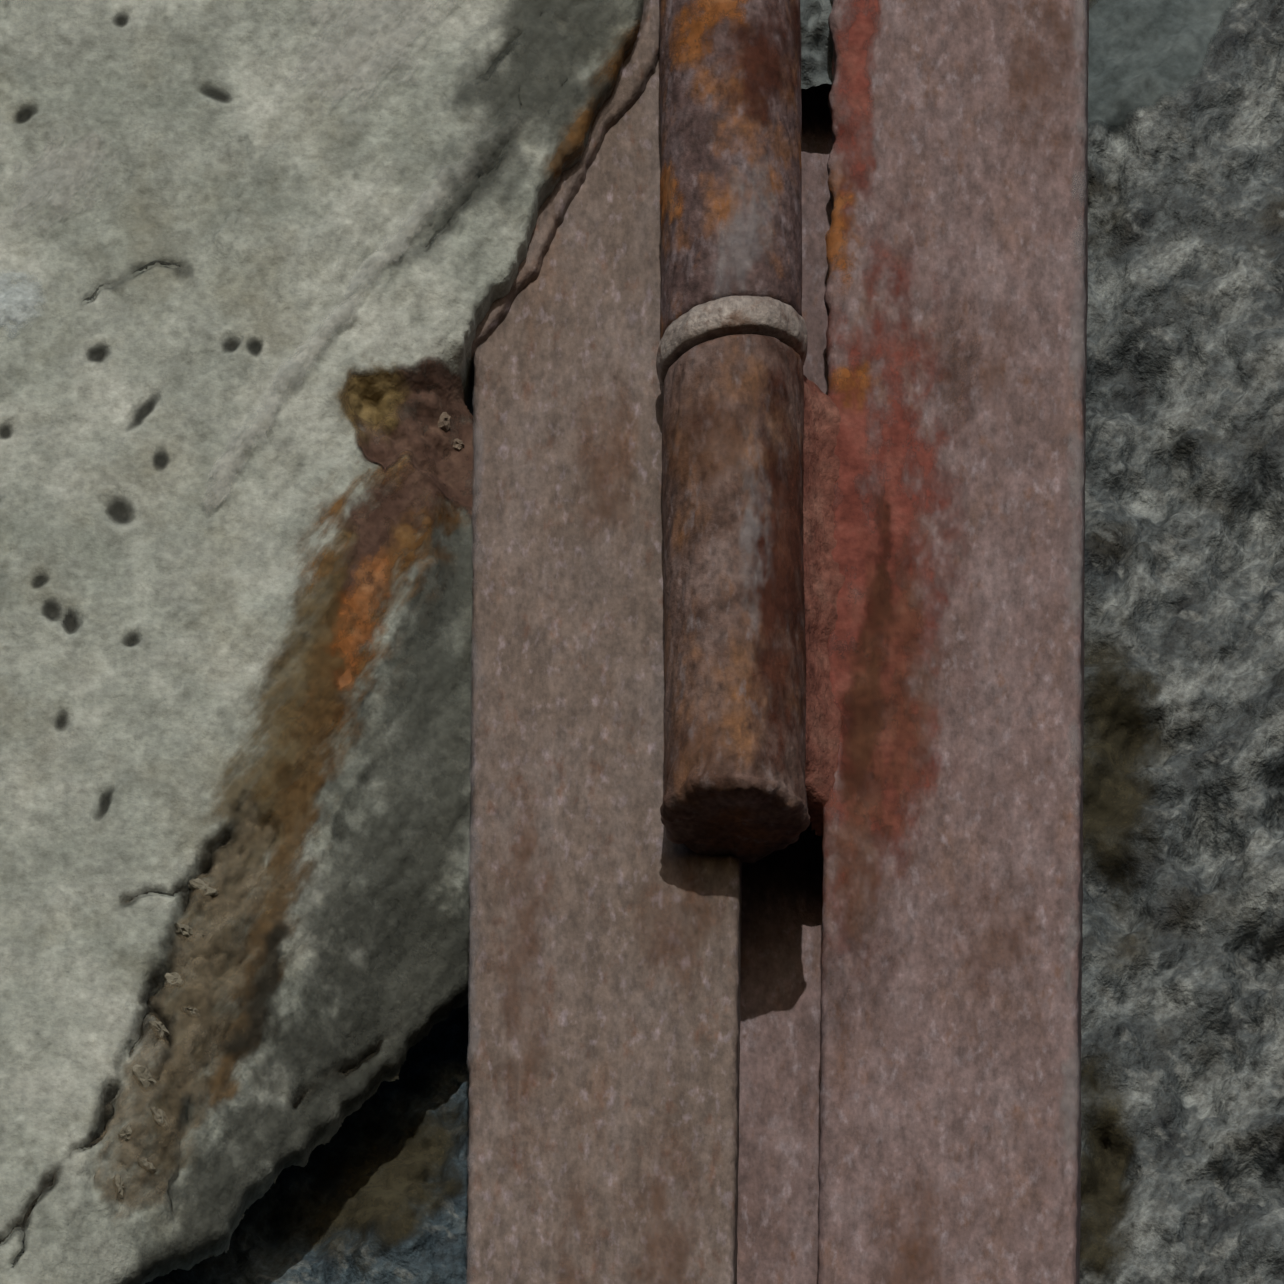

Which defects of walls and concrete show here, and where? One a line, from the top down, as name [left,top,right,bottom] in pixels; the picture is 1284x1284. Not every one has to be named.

corrosion [659,164,682,224]
corrosion [670,0,801,123]
corrosion [825,0,880,282]
corrosion [752,429,807,766]
corrosion [824,314,951,892]
corrosion [145,451,459,1174]
crack [121,830,234,1061]
crack [0,1084,121,1265]
crack [167,1172,179,1211]